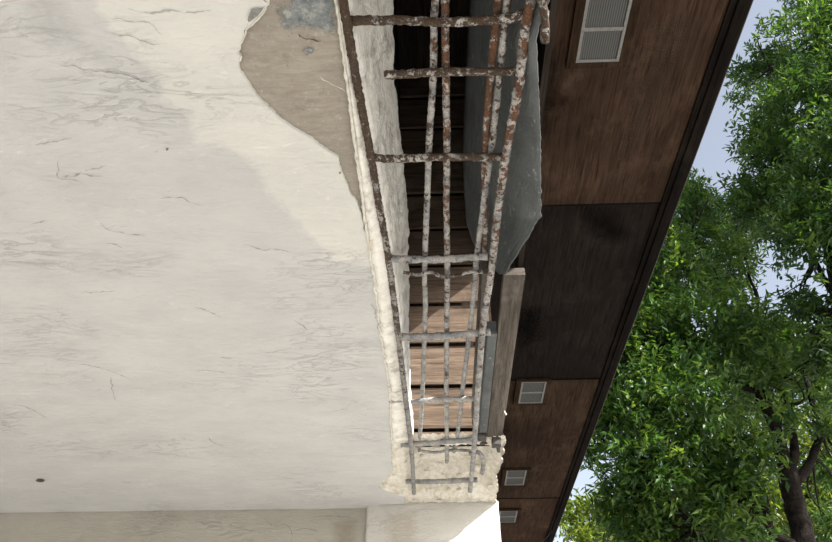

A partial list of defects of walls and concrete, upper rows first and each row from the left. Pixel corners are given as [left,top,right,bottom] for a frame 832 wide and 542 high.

spalling [238,0,550,503]